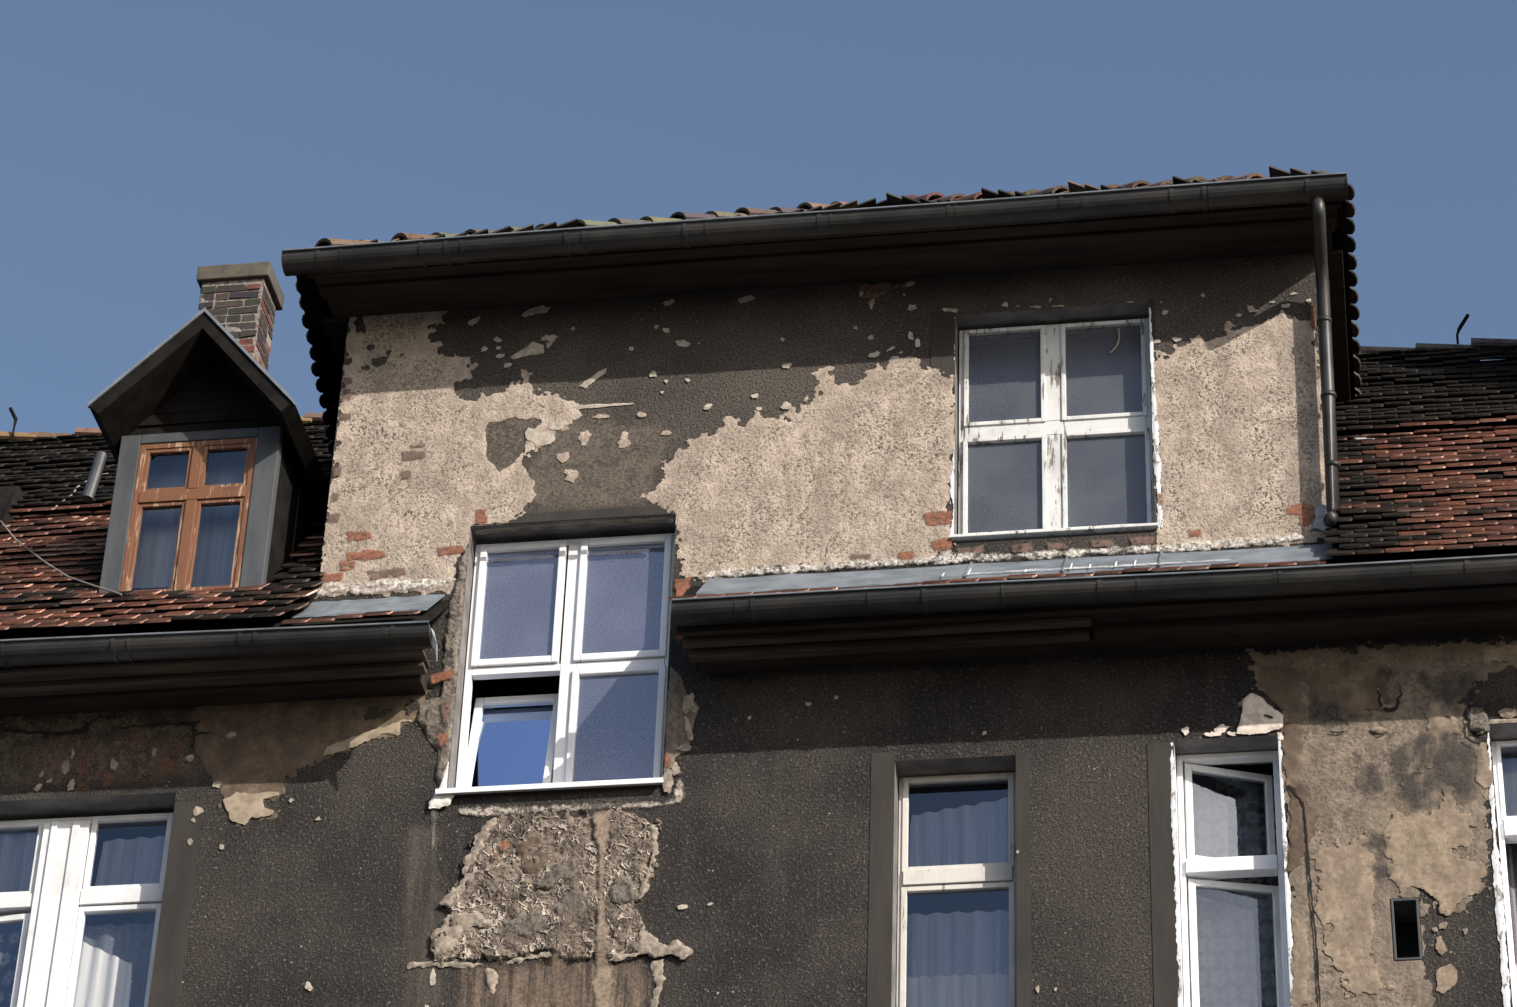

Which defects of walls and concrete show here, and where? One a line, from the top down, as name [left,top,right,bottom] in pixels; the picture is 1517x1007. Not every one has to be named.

peeling [521,305,550,317]
spalling [856,279,917,311]
peeling [1091,292,1333,553]
peeling [187,311,983,845]
flaking render [1012,543,1067,552]
spalling [407,807,693,1007]
peeling [1238,635,1517,1007]